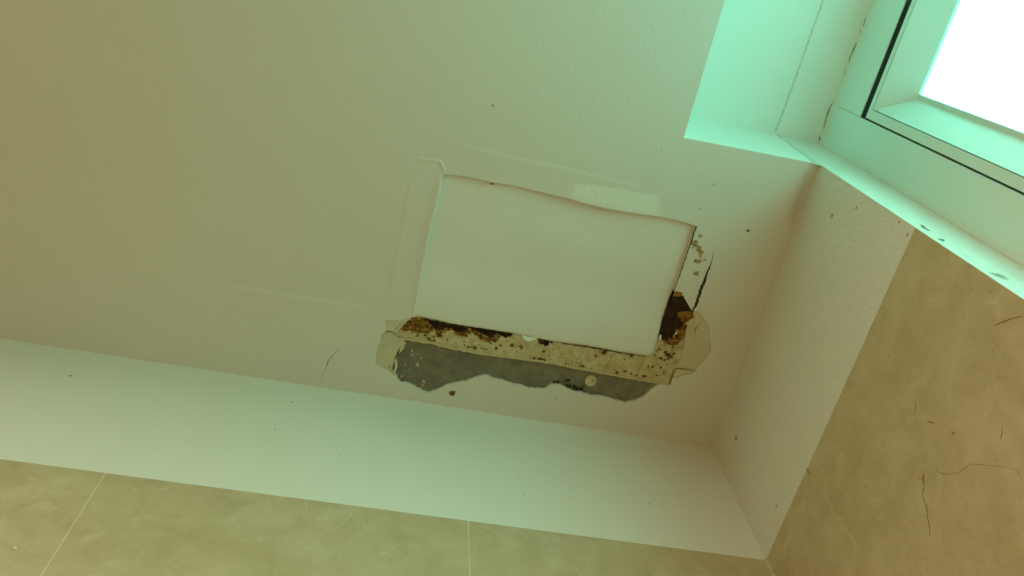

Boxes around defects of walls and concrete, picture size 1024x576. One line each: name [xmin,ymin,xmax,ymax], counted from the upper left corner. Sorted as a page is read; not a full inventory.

crack [674,226,714,312]
corrosion [399,317,523,352]
spalling [376,316,656,401]
corrosion [565,291,694,377]
peeling [670,311,711,384]
crack [918,463,1018,535]